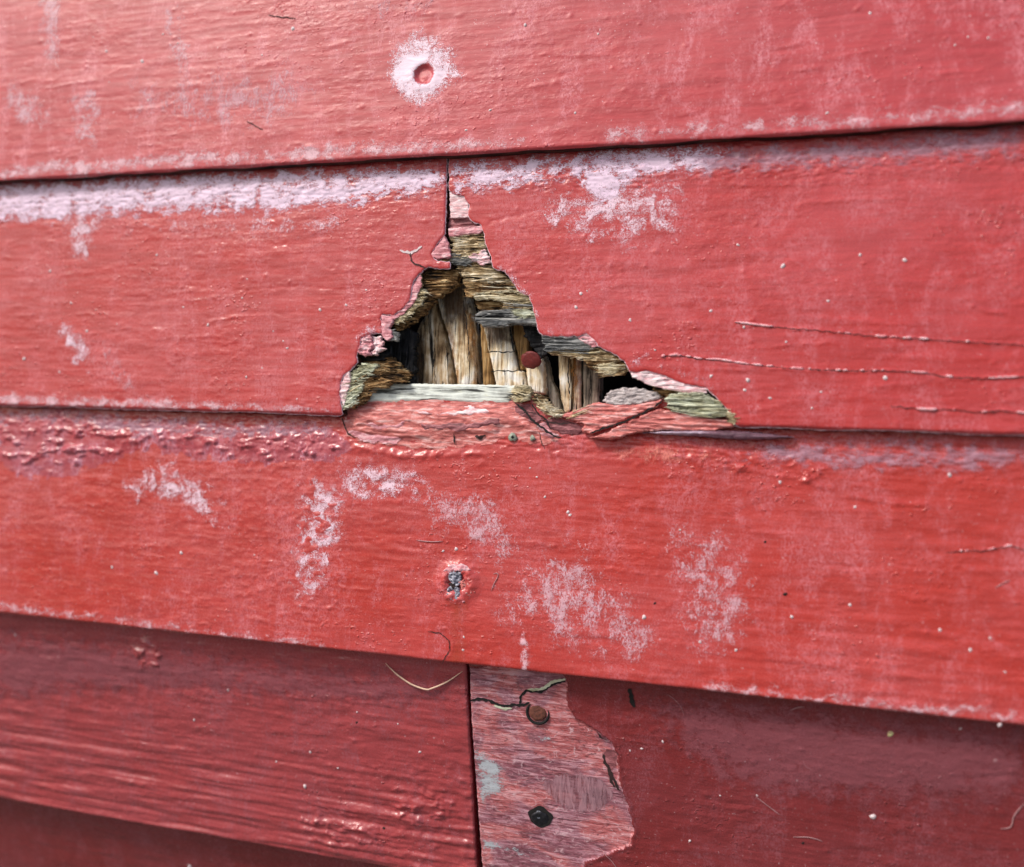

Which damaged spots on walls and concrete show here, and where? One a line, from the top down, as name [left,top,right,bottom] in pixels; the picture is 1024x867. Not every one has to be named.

peeling [431,192,483,260]
peeling [468,249,492,266]
peeling [357,274,423,357]
peeling [578,334,598,348]
crack [735,321,1024,346]
peeling [626,366,708,394]
crack [661,353,1024,380]
peeling [339,372,583,451]
crack [891,406,1024,414]
peeling [470,666,634,867]